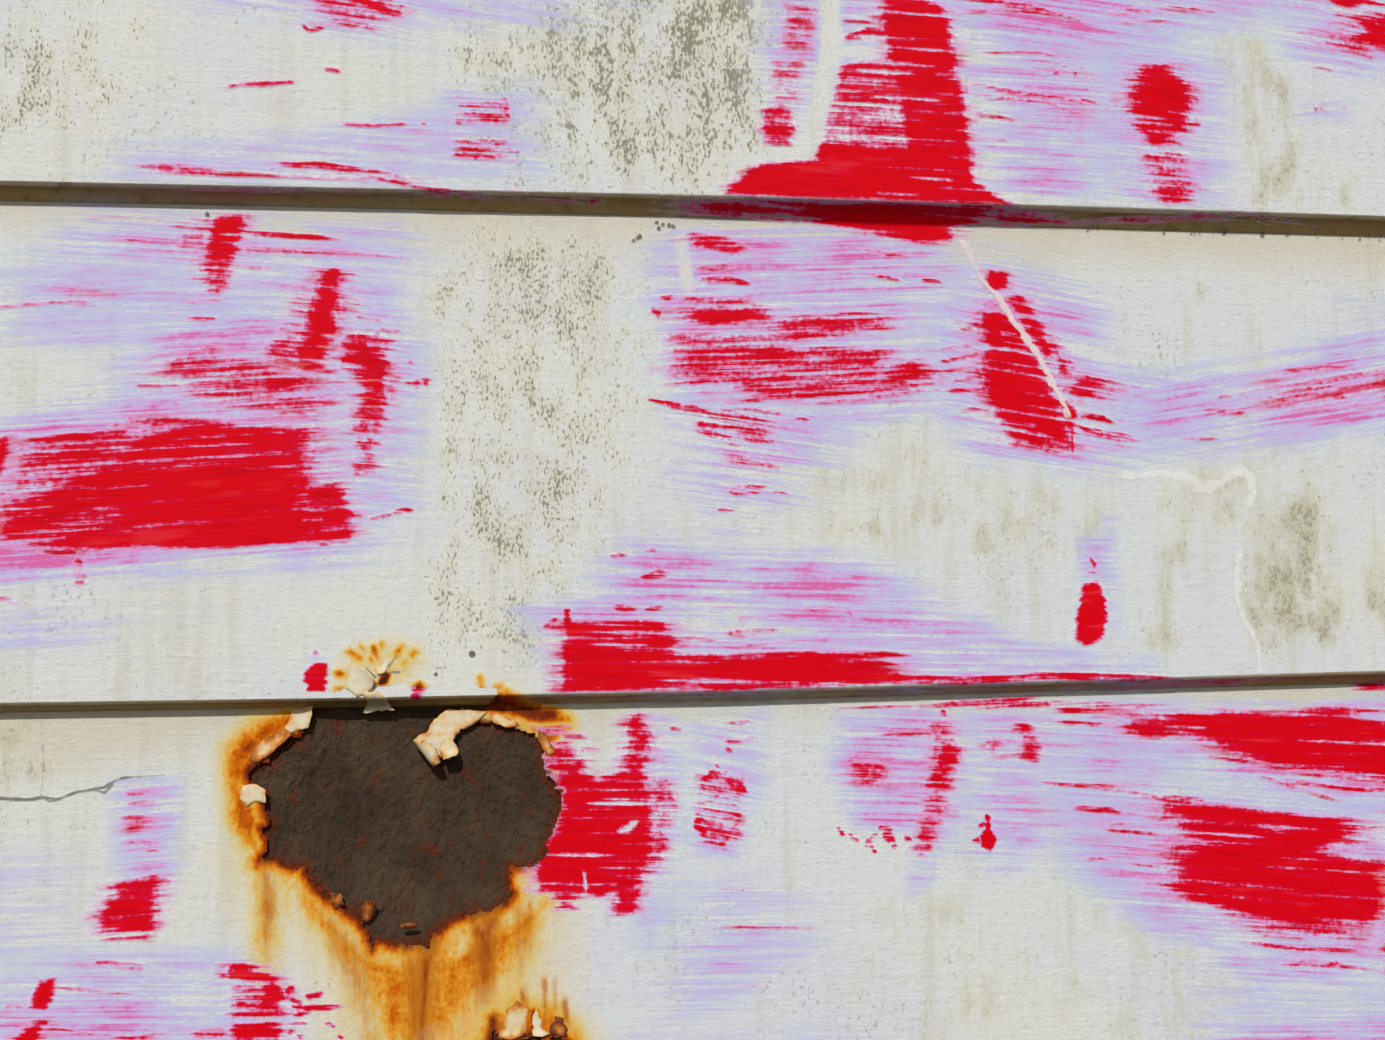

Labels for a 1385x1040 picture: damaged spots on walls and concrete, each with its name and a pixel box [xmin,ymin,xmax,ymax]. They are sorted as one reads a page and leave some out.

damp [448,0,793,198]
damp [415,226,660,677]
damp [1161,470,1385,660]
corrosion [332,640,428,713]
peeling [248,706,313,763]
peeling [413,708,519,767]
crack [0,763,140,802]
peeling [239,784,266,807]
corrosion [220,673,587,1040]